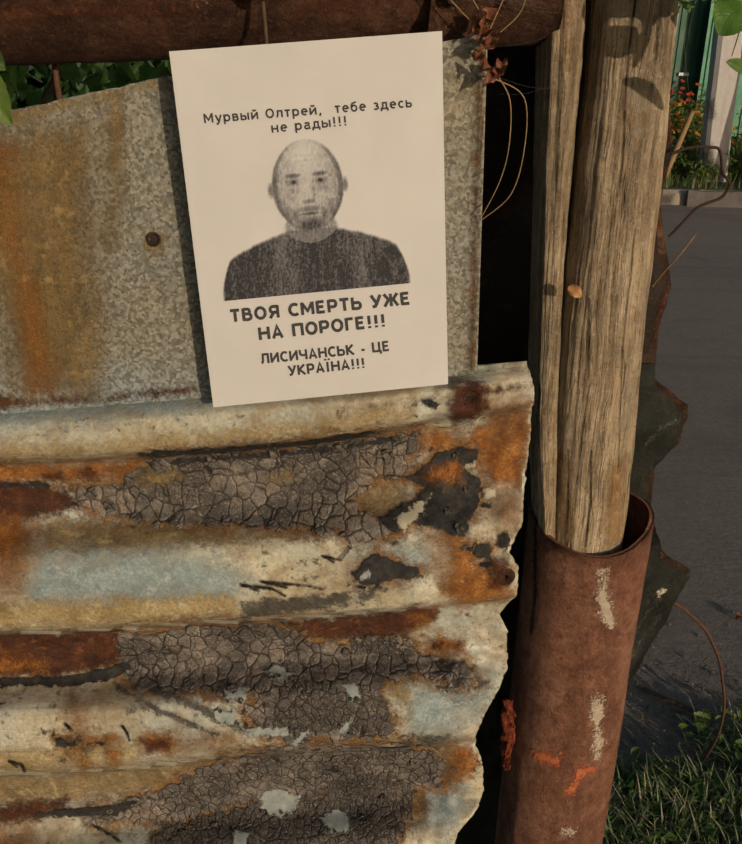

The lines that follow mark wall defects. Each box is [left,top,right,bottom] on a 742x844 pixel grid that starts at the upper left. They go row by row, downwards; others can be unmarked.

corrosion [0,408,408,584]
crack [64,423,428,564]
peeling [394,498,430,532]
corrosion [352,377,534,607]
peeling [482,487,496,500]
corrosion [0,593,238,679]
corrosion [283,603,440,640]
corrosion [428,632,470,657]
crack [81,581,483,843]